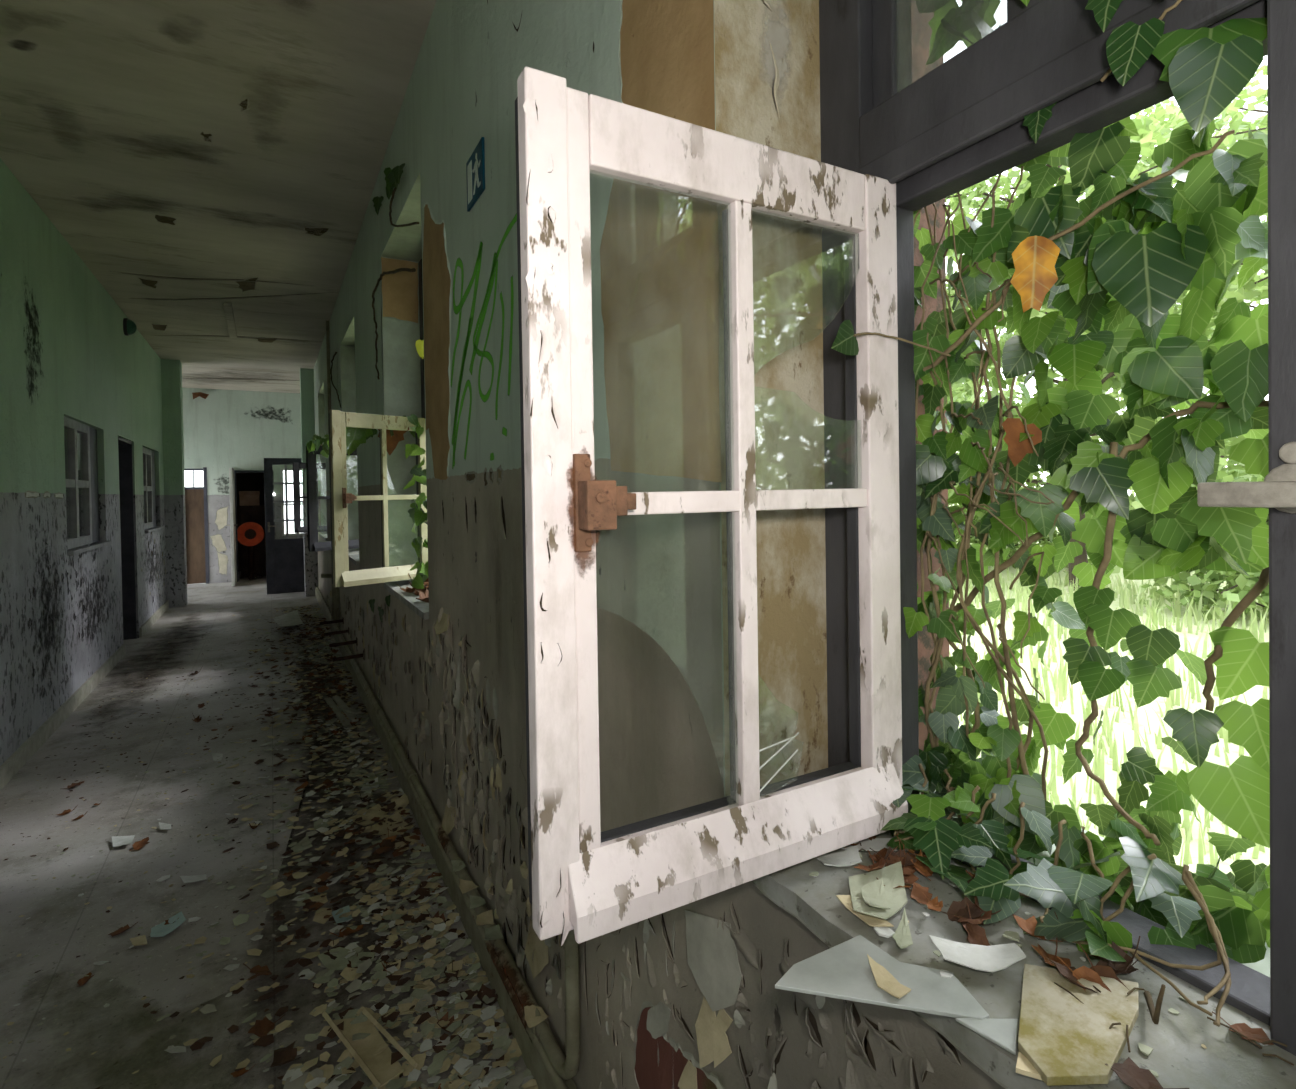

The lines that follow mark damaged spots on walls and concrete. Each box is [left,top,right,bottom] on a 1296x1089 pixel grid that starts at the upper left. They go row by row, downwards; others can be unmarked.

peeling [619,0,821,162]
peeling [381,202,452,480]
peeling [752,211,825,490]
leakage [34,555,110,691]
rust [567,468,599,574]
peeling [756,508,828,787]
peeling [313,777,410,924]
peeling [413,607,571,1028]